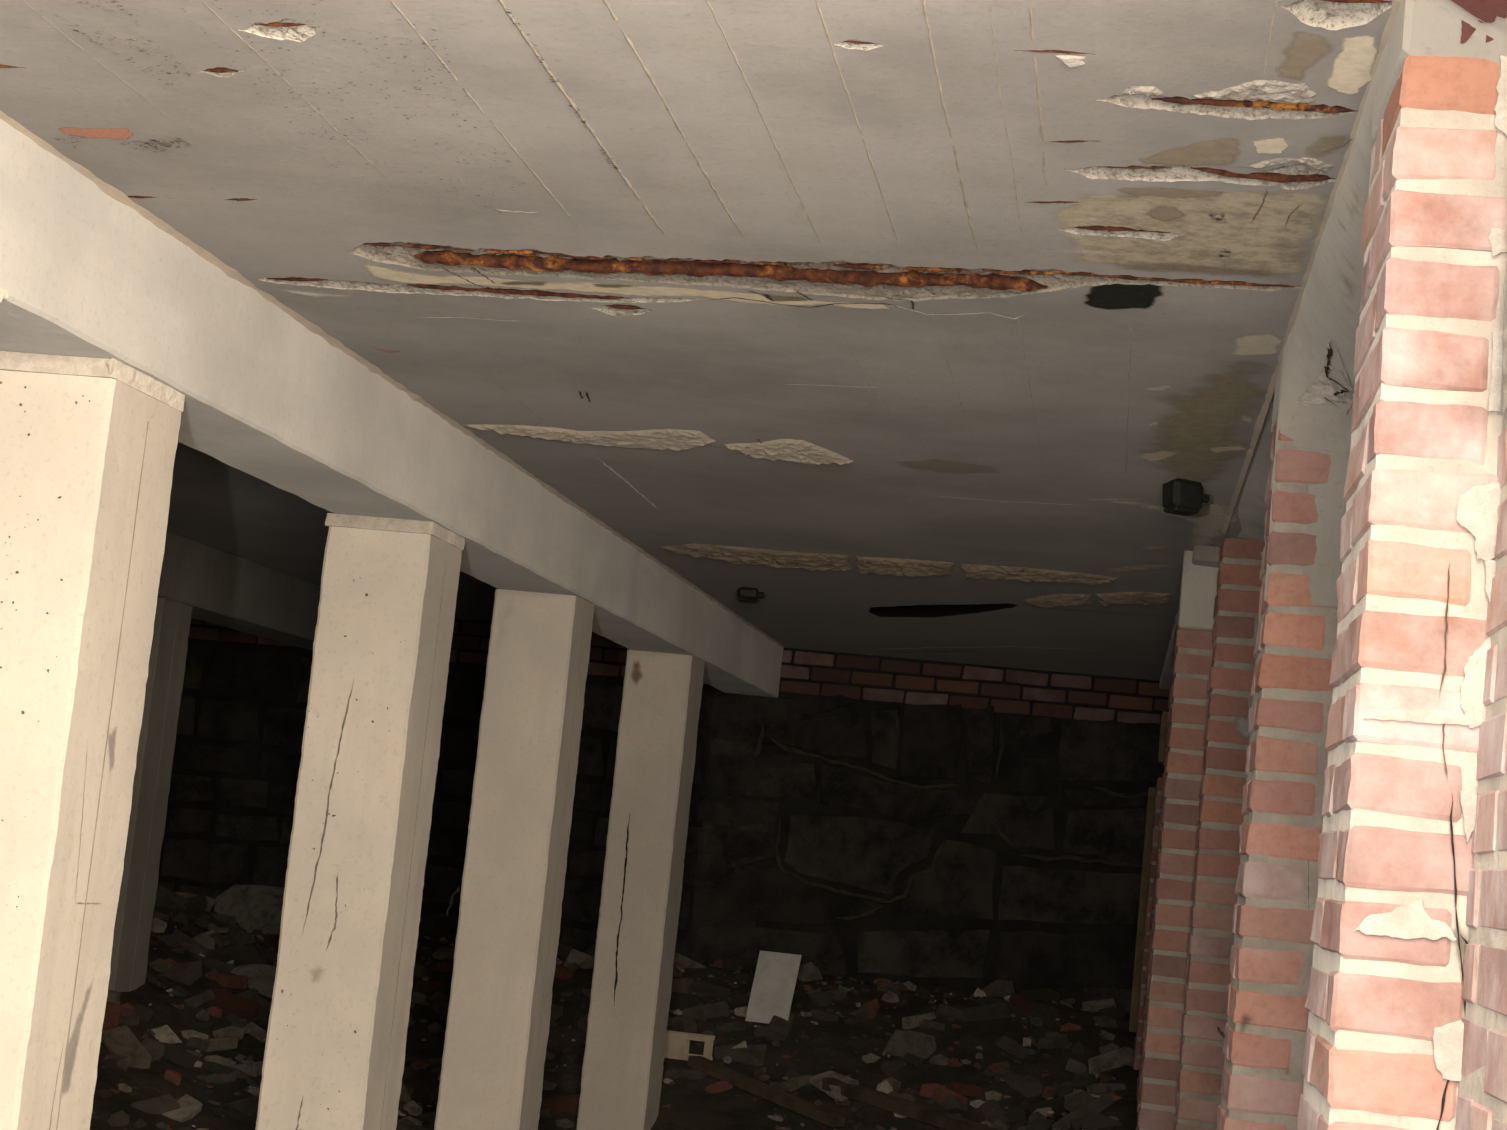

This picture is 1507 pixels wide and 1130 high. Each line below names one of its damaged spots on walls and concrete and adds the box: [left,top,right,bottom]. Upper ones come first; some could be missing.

spalling [1275,0,1392,30]
flaking render [1451,0,1507,44]
spalling [53,0,524,215]
spalling [1096,80,1358,120]
spalling [1064,157,1336,190]
spalling [255,242,1301,316]
water stain [1062,188,1322,309]
crack [1324,343,1353,409]
crack [302,679,354,950]
crack [1439,563,1468,1012]
crack [614,816,630,1007]
crack [1436,1080,1449,1130]